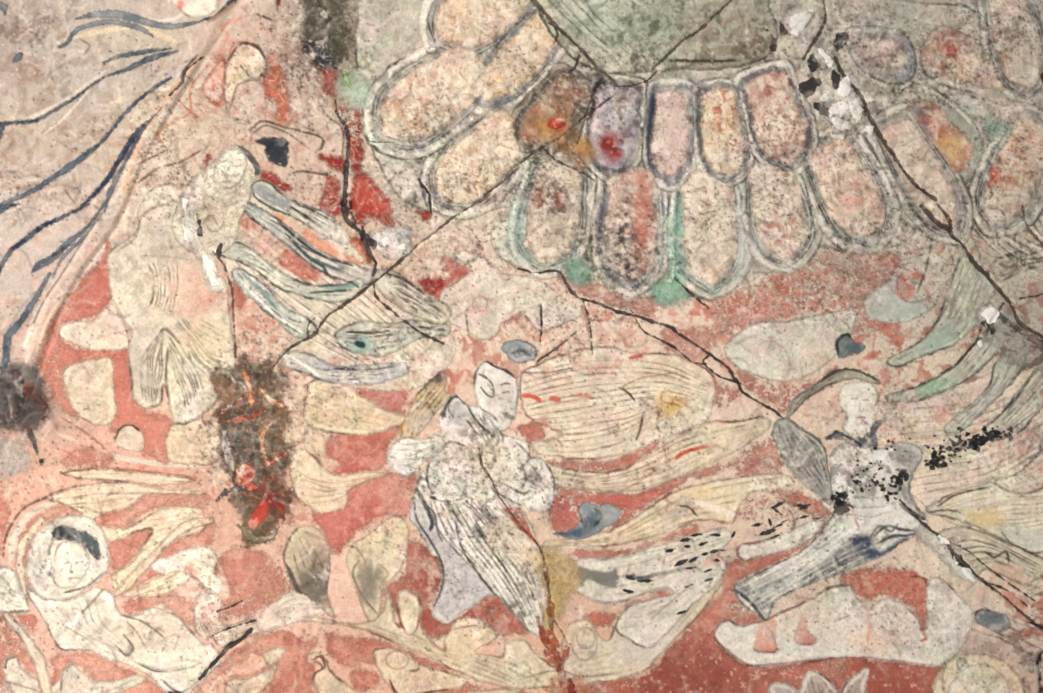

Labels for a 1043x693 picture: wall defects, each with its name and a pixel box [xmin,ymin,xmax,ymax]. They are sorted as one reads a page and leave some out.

spalling [763,3,814,51]
spalling [799,32,876,140]
crack [270,0,732,370]
crack [802,0,1043,363]
crack [214,253,237,358]
crack [518,267,783,419]
water stain [0,369,49,478]
peeling [830,438,911,515]
peeling [924,426,1013,470]
crack [168,600,257,693]
crack [478,448,565,637]
crack [899,499,1043,693]